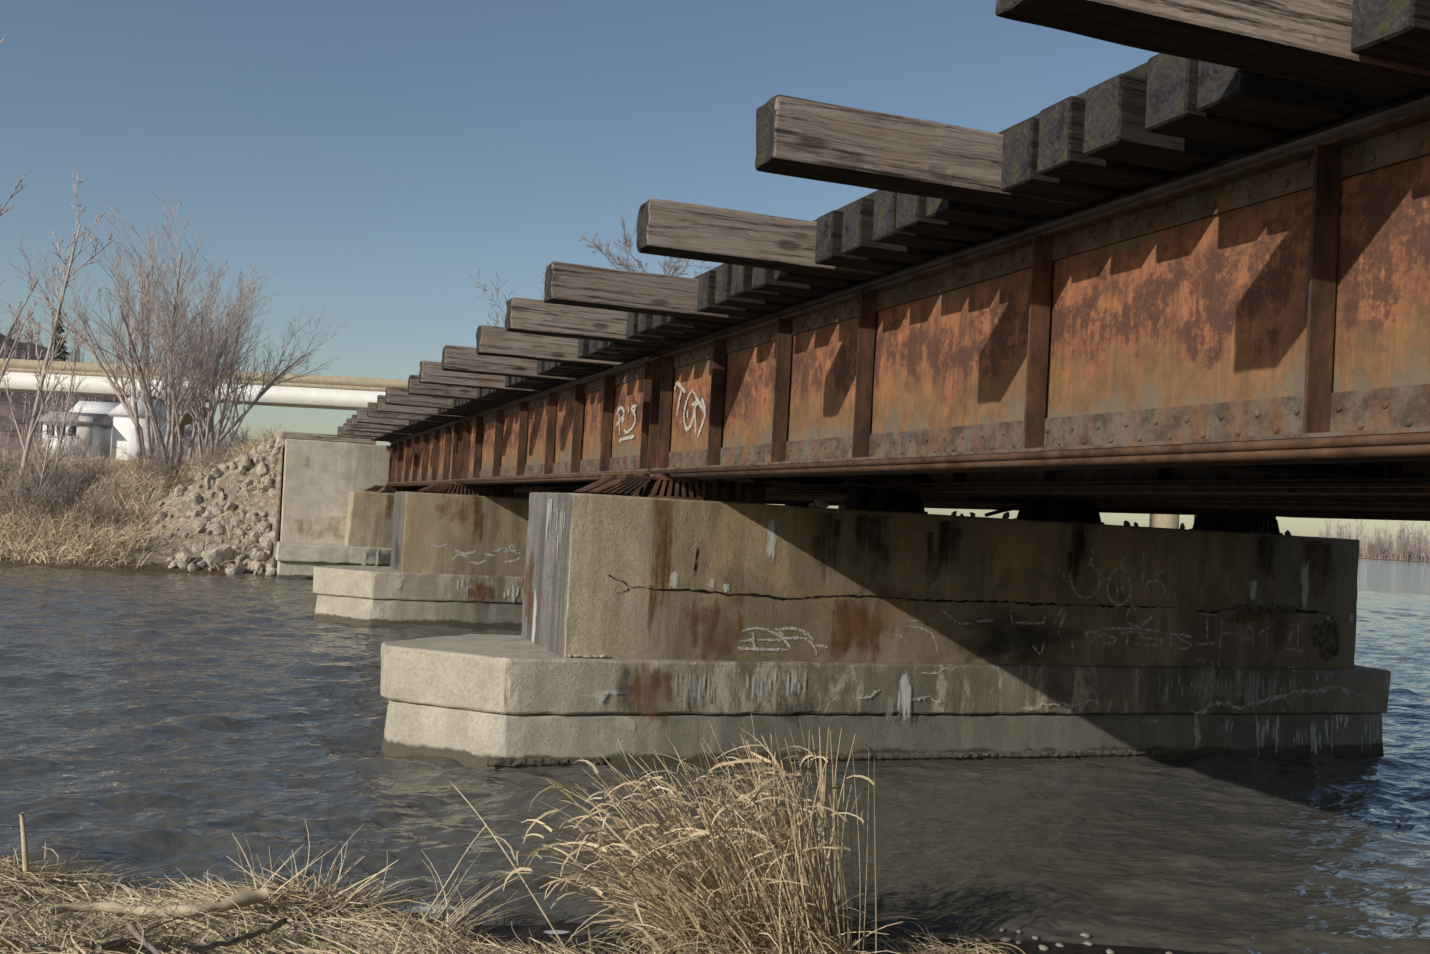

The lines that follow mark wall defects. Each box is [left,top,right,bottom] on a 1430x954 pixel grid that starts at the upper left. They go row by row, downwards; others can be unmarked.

crack [608,548,1234,614]
crack [1296,609,1336,625]
efflorescence [1159,671,1379,755]